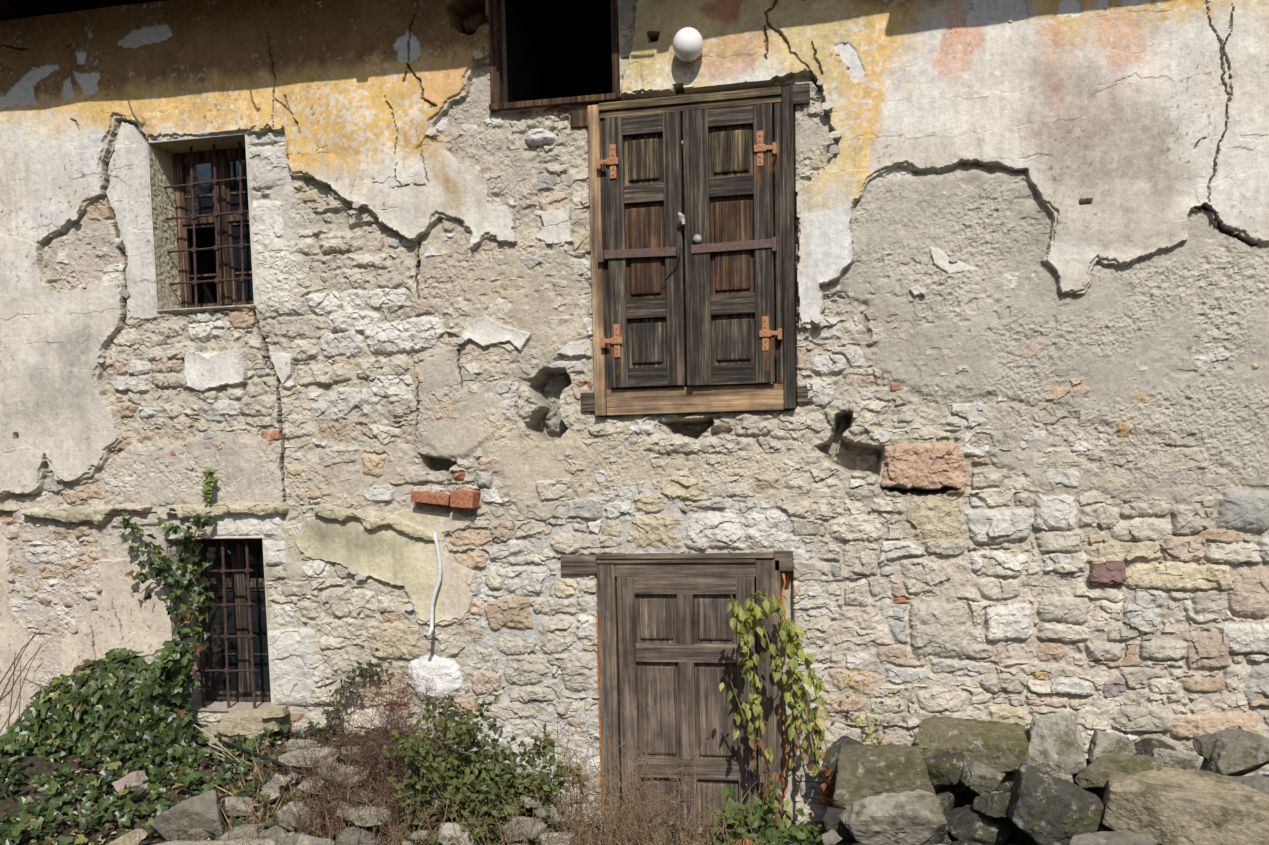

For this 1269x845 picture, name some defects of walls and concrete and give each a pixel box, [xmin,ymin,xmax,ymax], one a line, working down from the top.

peeling [0,52,100,108]
peeling [117,25,173,49]
peeling [393,31,422,64]
crack [764,0,824,92]
flaking render [795,78,842,195]
crack [1190,1,1257,246]
flaking render [41,196,130,298]
flaking render [97,51,594,509]
flaking render [804,162,1269,497]
crack [256,317,287,504]
spalling [661,418,714,441]
flaking render [294,550,418,657]